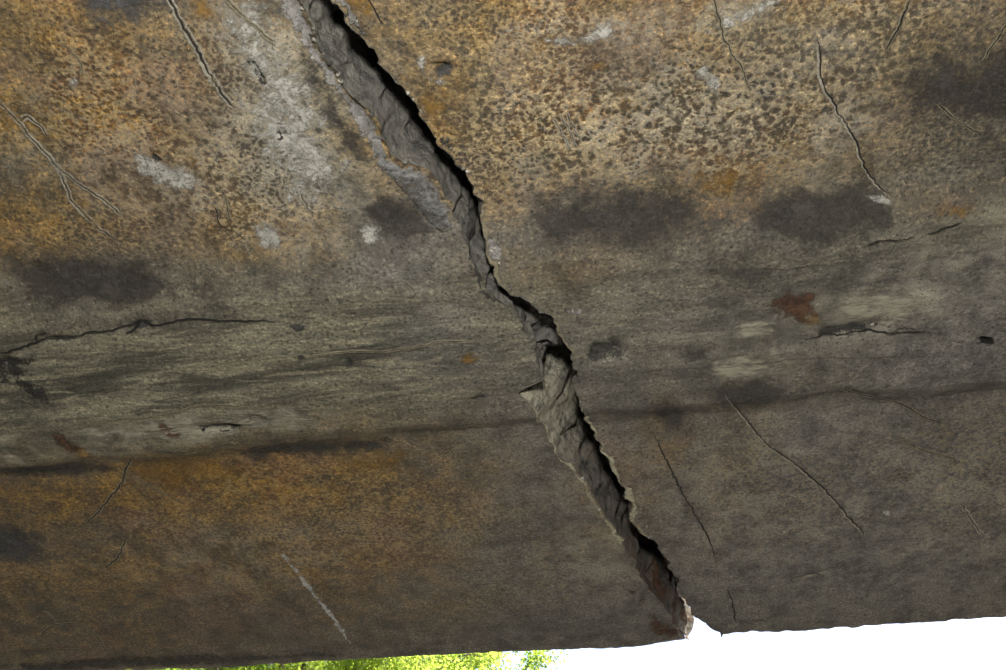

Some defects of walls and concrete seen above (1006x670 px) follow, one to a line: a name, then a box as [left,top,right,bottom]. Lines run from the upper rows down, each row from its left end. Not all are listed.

crack [166,0,242,110]
crack [712,0,753,103]
crack [814,35,891,197]
crack [0,100,125,245]
leakage [531,184,695,248]
leakage [755,183,893,242]
leakage [12,258,174,310]
crack [1,318,278,354]
crack [298,0,736,640]
crack [726,398,869,543]